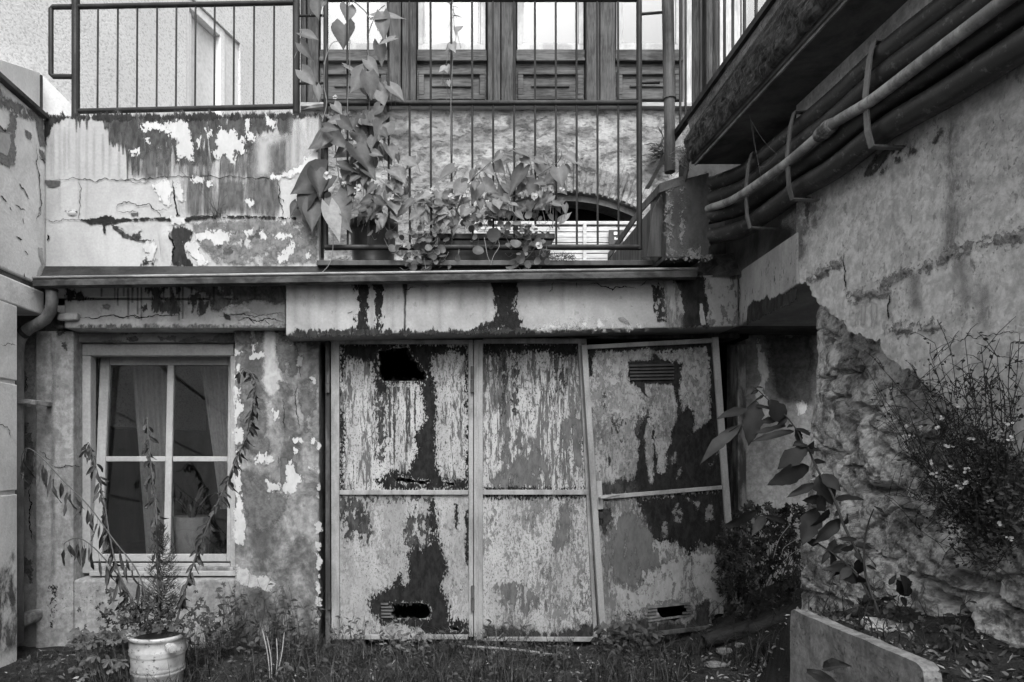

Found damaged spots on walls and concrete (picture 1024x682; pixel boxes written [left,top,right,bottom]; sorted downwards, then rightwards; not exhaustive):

spalling [0,112,46,169]
peeling [128,118,256,165]
peeling [270,149,321,181]
crack [2,146,296,279]
peeling [152,175,214,228]
peeling [184,227,313,266]
water stain [64,286,286,317]
water stain [234,282,642,433]
peeling [593,346,711,426]
peeling [254,437,321,498]
peeling [235,556,276,592]
peeling [314,521,323,622]